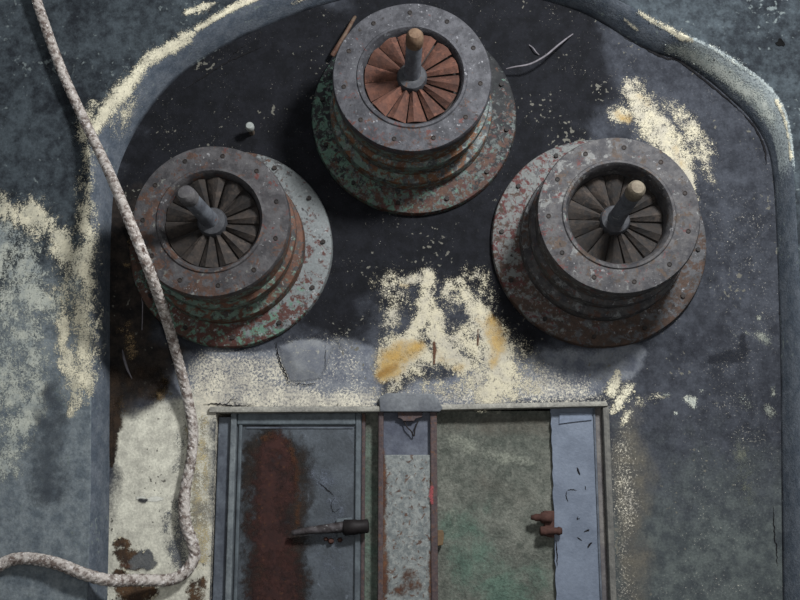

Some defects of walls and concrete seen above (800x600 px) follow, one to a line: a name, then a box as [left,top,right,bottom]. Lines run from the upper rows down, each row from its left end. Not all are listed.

water stain [109,365,168,468]
rust [240,425,315,600]